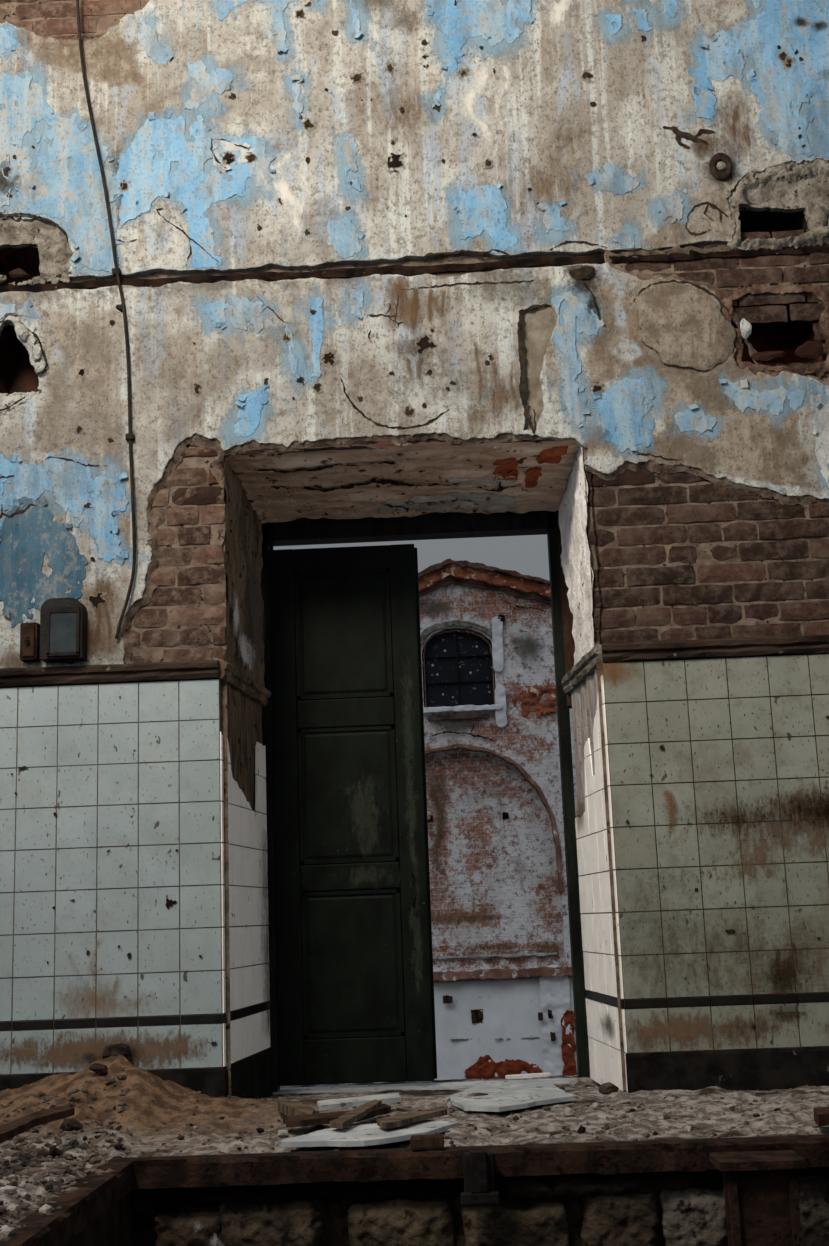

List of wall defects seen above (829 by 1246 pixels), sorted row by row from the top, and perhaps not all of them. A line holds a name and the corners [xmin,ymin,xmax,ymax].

peeling [0,452,133,627]
peeling [0,0,282,416]
spalling [120,0,829,817]
corrosion [701,790,829,881]